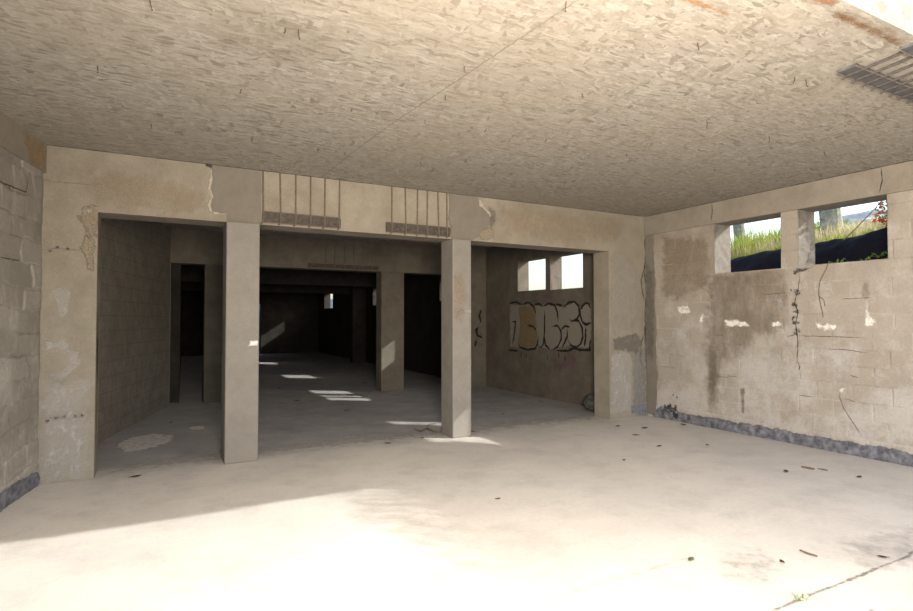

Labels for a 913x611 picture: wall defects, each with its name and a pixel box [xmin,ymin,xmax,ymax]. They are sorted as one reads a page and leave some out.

corrosion [839,16,896,42]
spalling [836,42,913,104]
crack [52,1,913,373]
spalling [77,205,98,271]
crack [38,221,96,376]
crack [36,415,89,471]